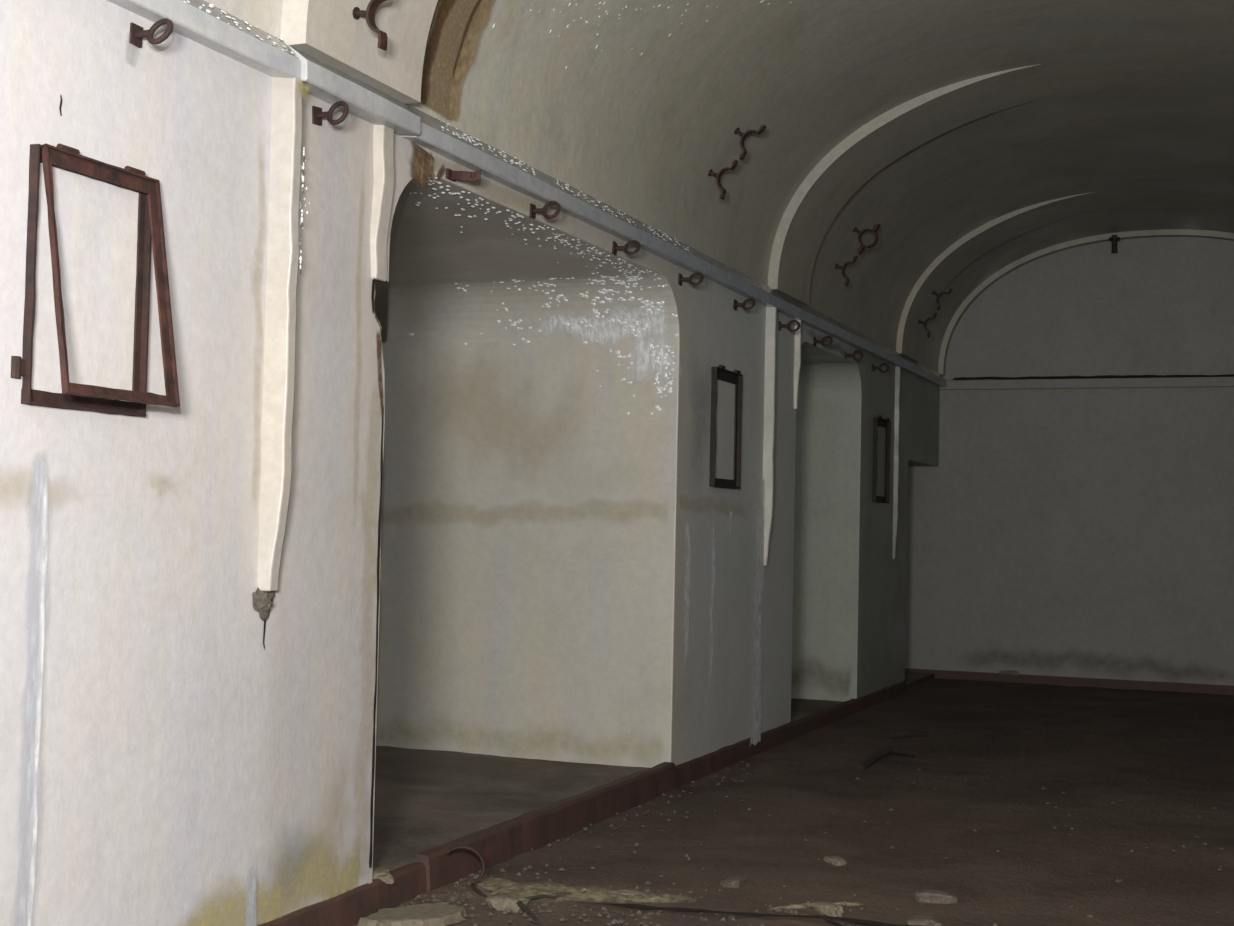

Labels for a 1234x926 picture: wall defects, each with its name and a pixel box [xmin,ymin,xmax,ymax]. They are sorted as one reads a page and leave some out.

spalling [252,587,275,649]
water stain [246,873,256,926]